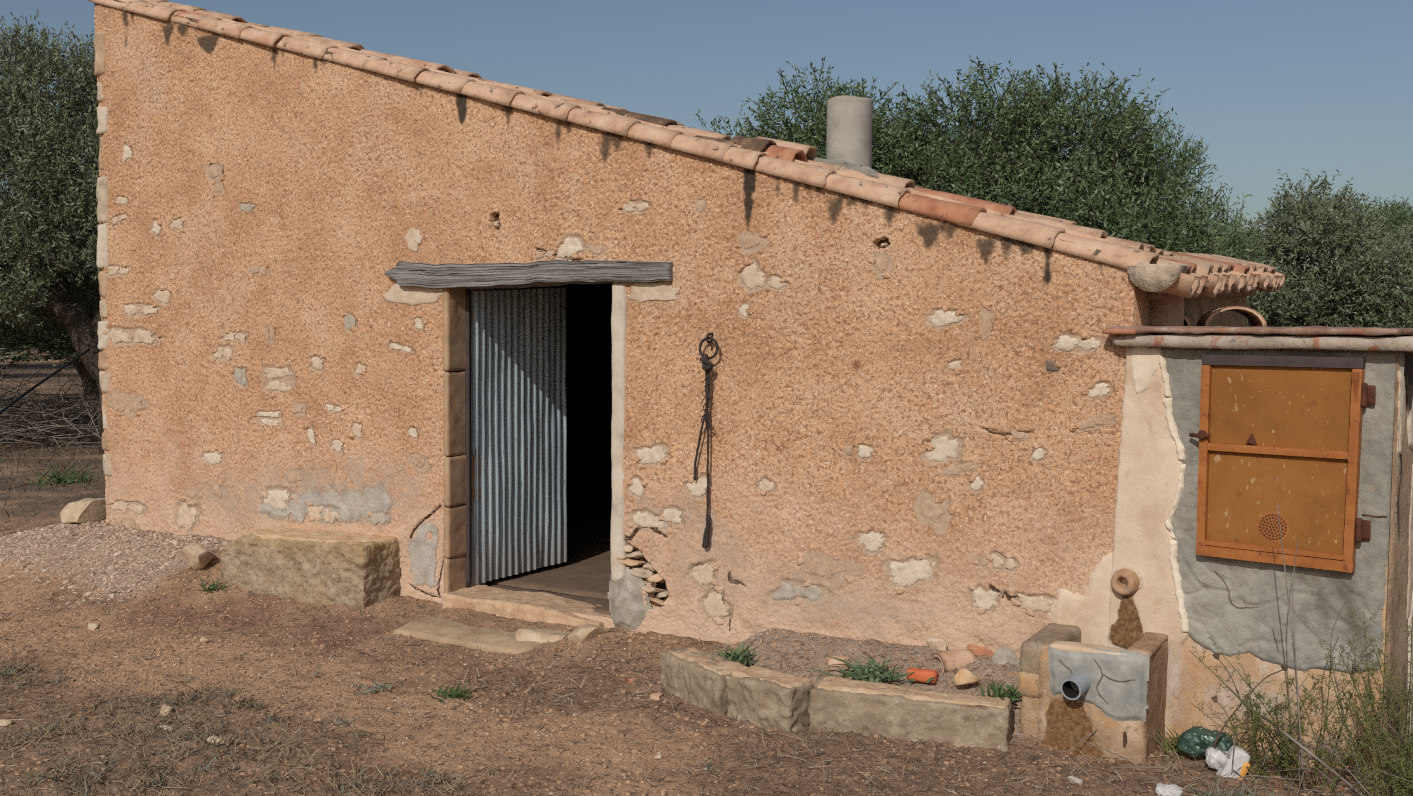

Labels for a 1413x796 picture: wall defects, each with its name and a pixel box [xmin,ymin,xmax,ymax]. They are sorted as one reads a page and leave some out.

water stain [162,23,220,53]
water stain [743,169,755,222]
water stain [776,177,868,221]
spalling [94,31,172,477]
water stain [918,223,956,246]
water stain [977,237,1051,283]
spalling [919,430,964,466]
spalling [259,486,340,526]
spalling [616,442,714,605]
spalling [913,489,956,536]
spalling [852,526,942,595]
water stain [1109,595,1143,648]